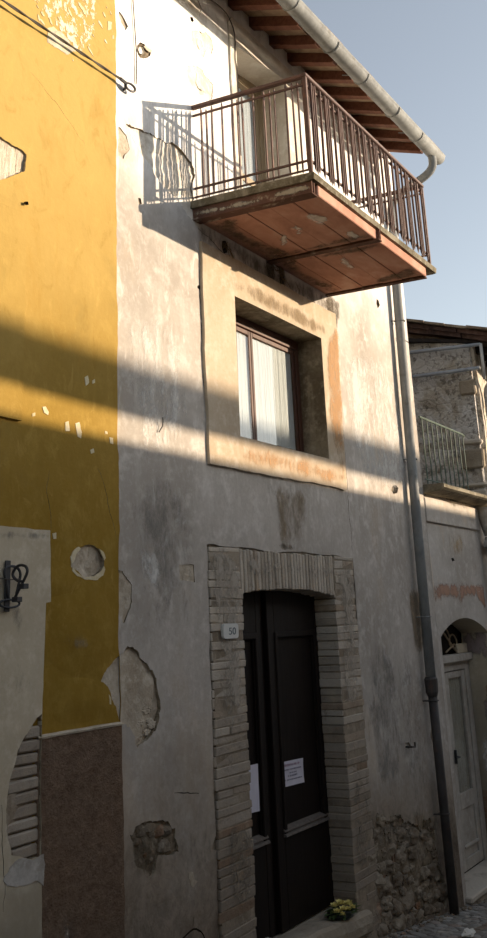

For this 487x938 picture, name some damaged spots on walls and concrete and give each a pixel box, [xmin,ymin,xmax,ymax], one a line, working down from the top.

peeling [35,0,128,61]
flaking render [186,66,213,101]
flaking render [0,137,26,180]
flaking render [118,124,195,220]
peeling [65,421,82,438]
flaking render [70,545,106,580]
flaking render [119,571,132,623]
flaking render [101,646,161,747]
flaking render [6,714,42,859]
flaking render [130,820,179,877]